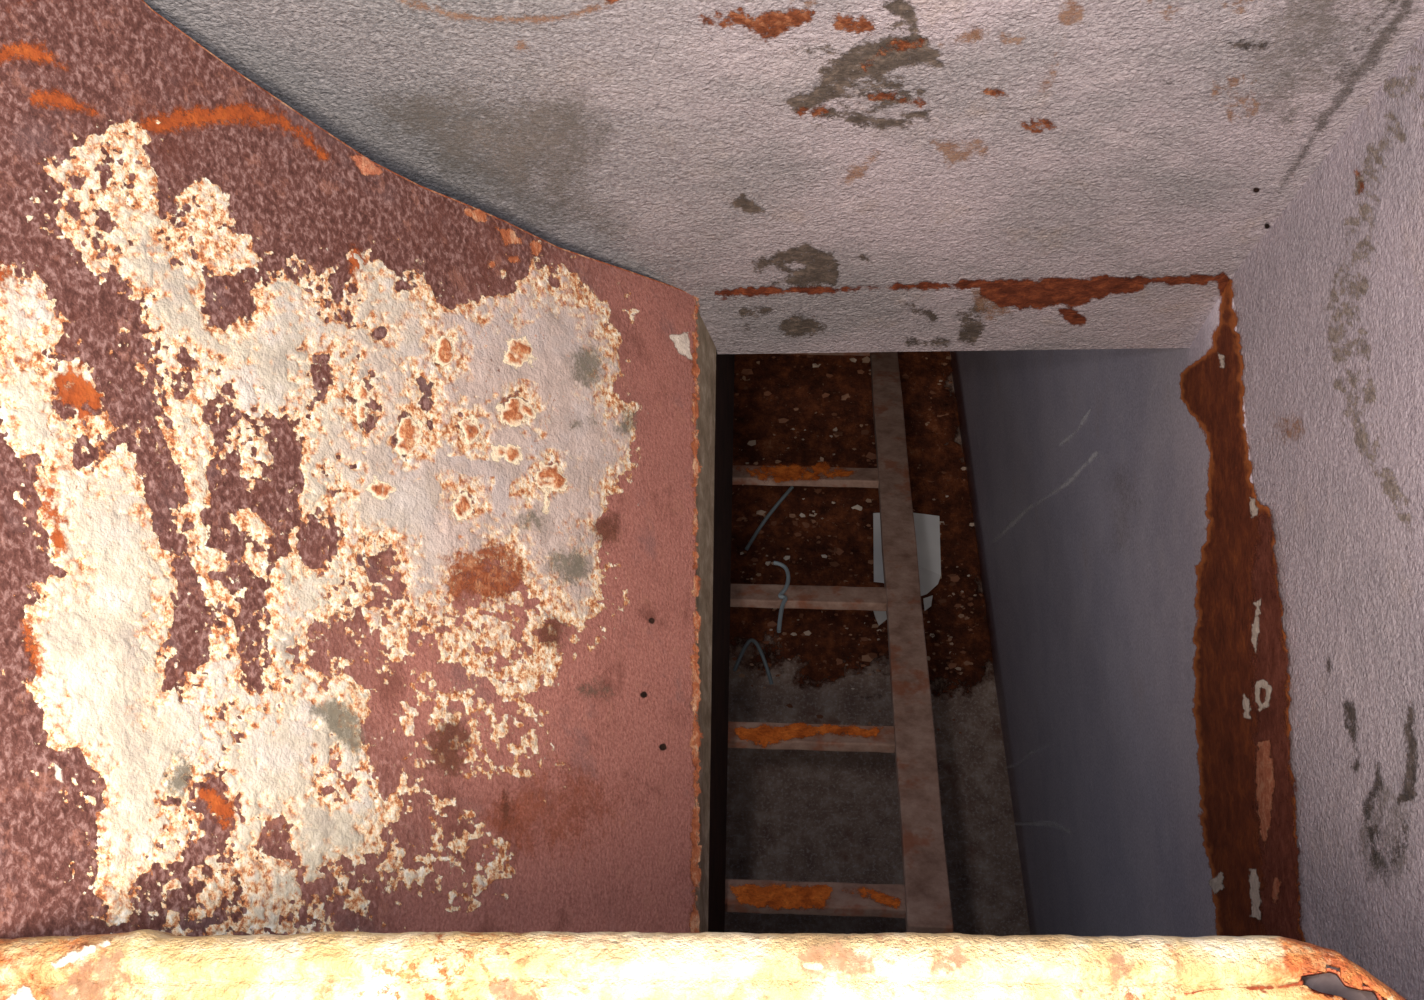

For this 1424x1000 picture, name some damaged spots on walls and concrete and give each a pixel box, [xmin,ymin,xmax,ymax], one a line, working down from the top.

corrosion [699,2,815,42]
corrosion [832,13,875,34]
corrosion [0,40,66,69]
corrosion [29,89,99,118]
corrosion [868,92,926,108]
corrosion [138,102,329,161]
peeling [0,119,642,968]
corrosion [1179,279,1305,942]
peeling [6,986,36,1000]
corrosion [46,950,131,1000]
corrosion [798,941,874,979]
corrosion [932,946,969,974]